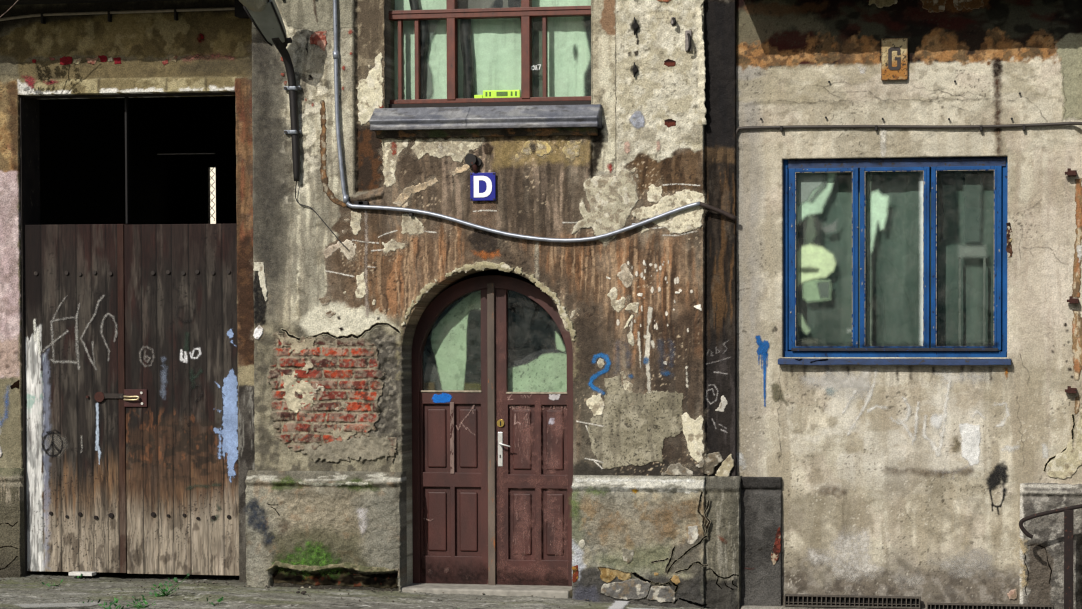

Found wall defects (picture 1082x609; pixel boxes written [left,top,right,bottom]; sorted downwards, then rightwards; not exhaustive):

peeling [868,0,898,8]
peeling [921,0,984,13]
peeling [356,52,384,126]
peeling [514,140,582,161]
peeling [381,137,485,253]
peeling [572,167,705,244]
peeling [606,263,643,346]
flaking render [253,262,398,463]
peeling [586,358,734,476]
peeling [1046,409,1082,479]
crack [0,522,18,570]
crack [630,491,749,607]